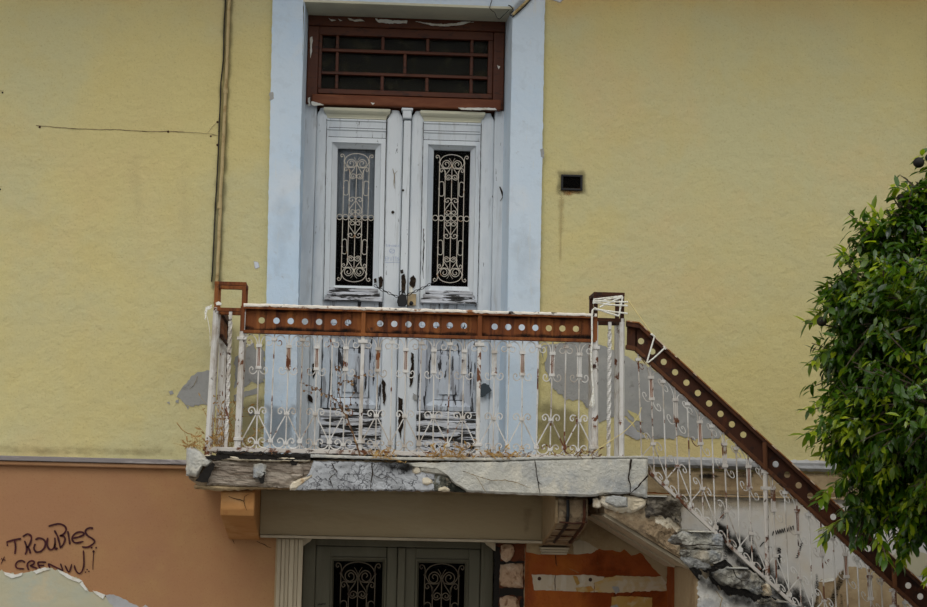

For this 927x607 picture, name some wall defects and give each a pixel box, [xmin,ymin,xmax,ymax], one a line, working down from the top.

rust [245,326,591,339]
flaking render [167,370,217,409]
flaking render [541,342,723,440]
spalling [194,455,313,491]
spalling [412,467,466,493]
crack [604,459,648,496]
flaking render [0,567,148,607]